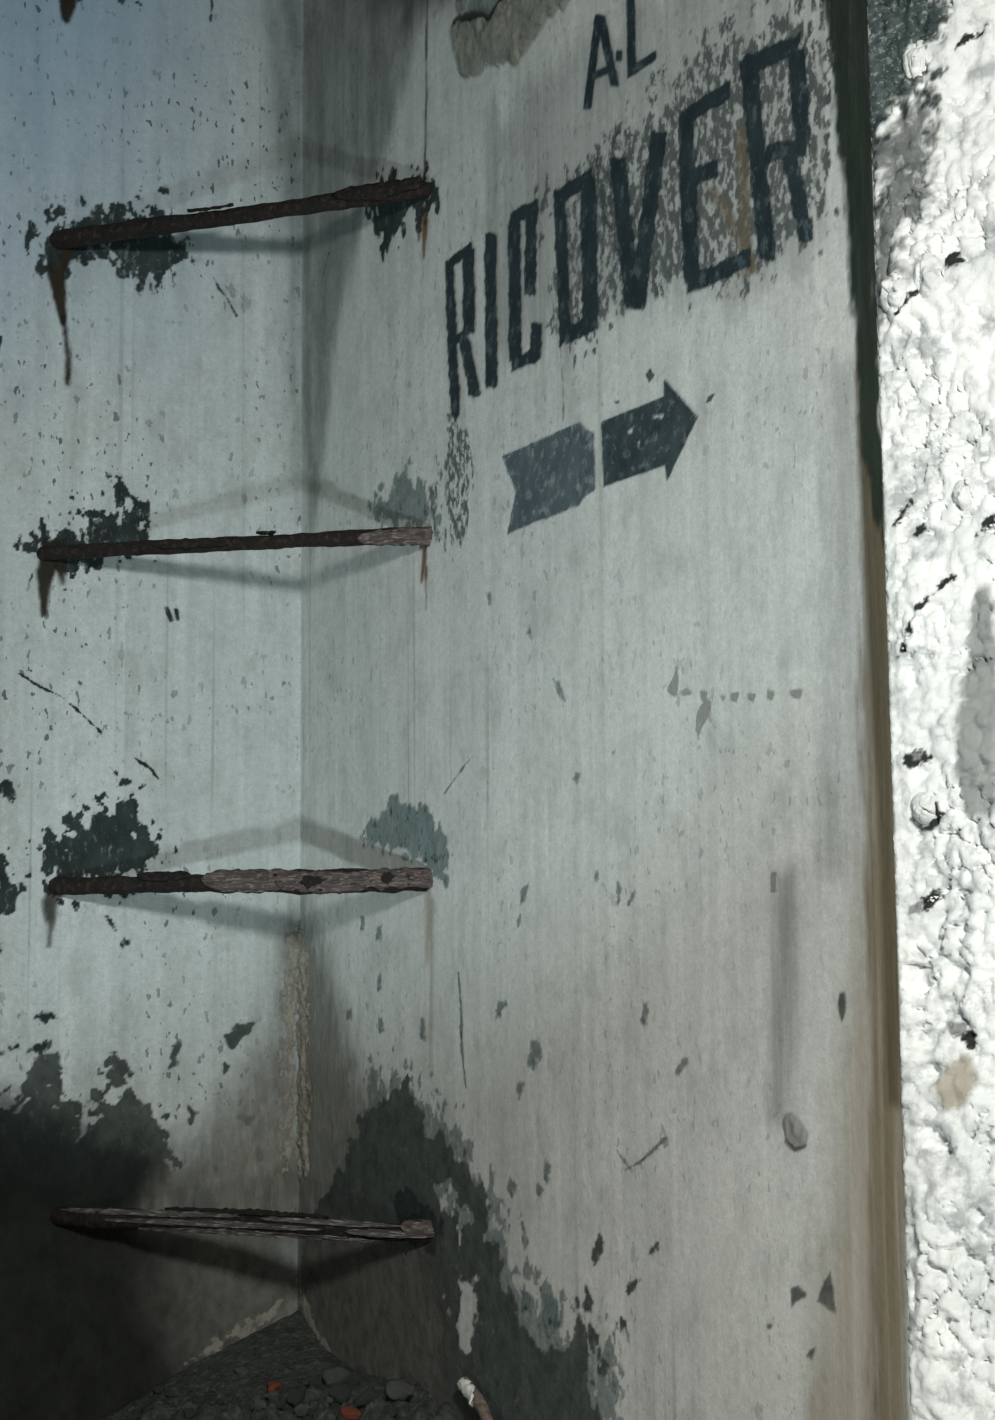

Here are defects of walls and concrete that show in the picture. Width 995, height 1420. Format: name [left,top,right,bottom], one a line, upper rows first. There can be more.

rust [60,0,76,22]
peeling [25,186,194,293]
rust [418,205,427,257]
rust [47,248,75,385]
rust [37,540,66,616]
peeling [0,771,178,915]
peeling [360,793,453,888]
rust [44,890,61,932]
peeling [223,1022,255,1074]
peeling [0,1012,182,1193]
water stain [0,919,445,1420]
peeling [313,1041,628,1420]